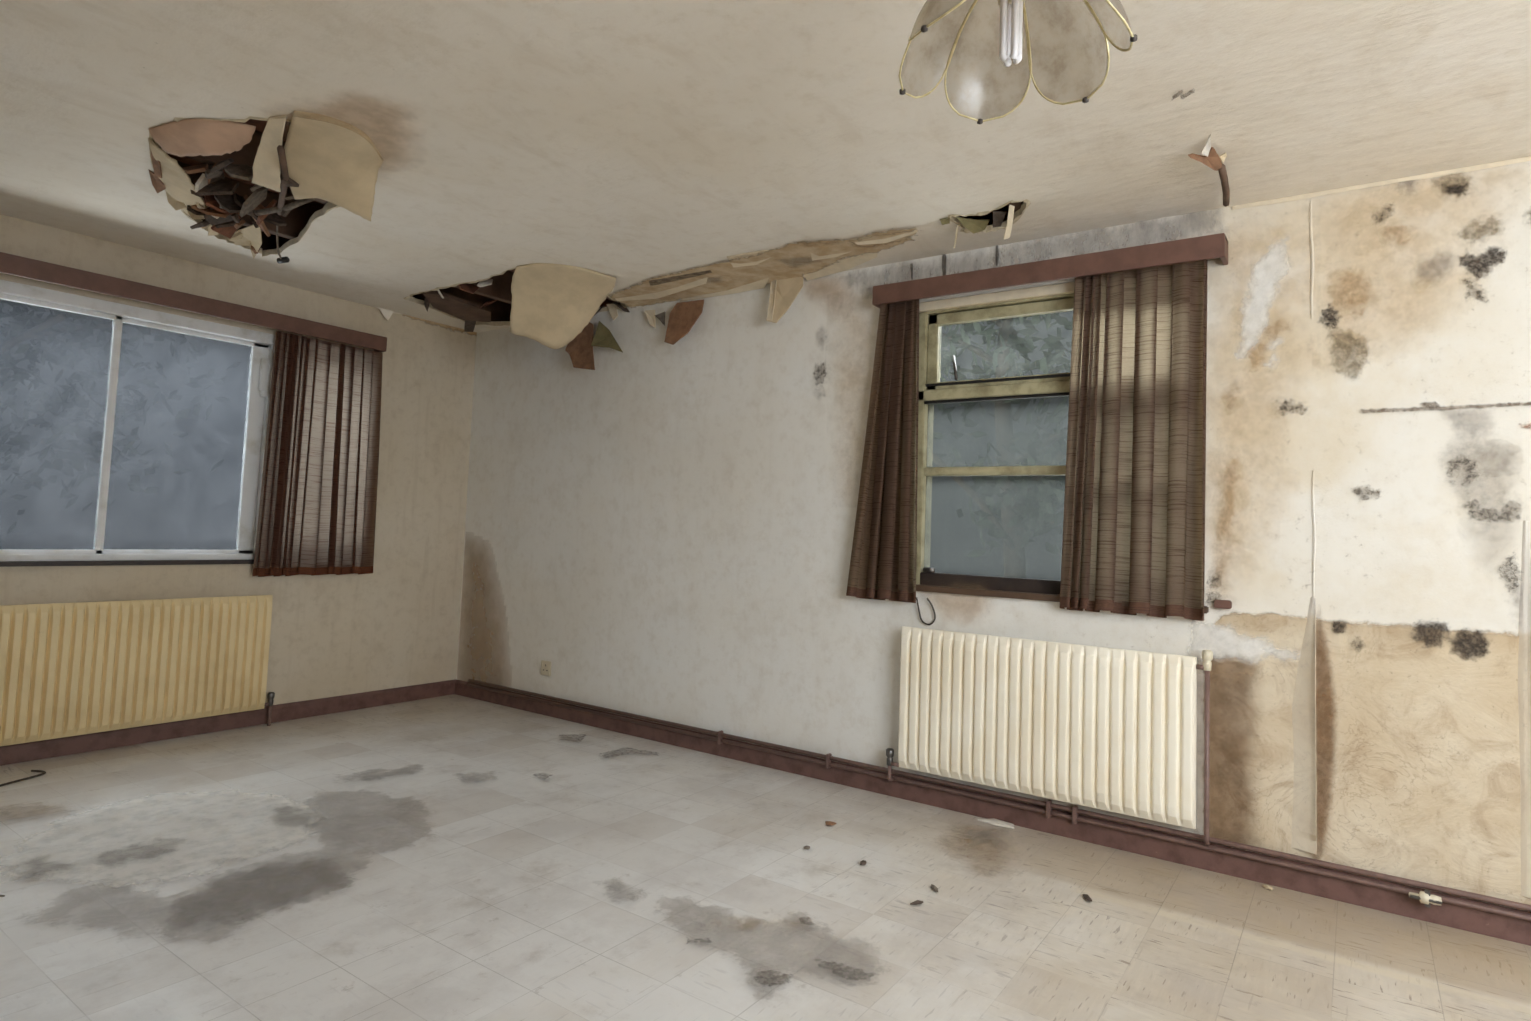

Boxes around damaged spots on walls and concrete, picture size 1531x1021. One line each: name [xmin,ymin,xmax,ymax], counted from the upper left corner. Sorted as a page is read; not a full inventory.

damp [1444,178,1467,194]
damp [1460,225,1505,301]
peeling [1240,244,1288,355]
damp [1321,307,1367,375]
crack [1362,402,1531,413]
damp [1465,504,1520,521]
peeling [1189,624,1294,661]
flaking render [1316,631,1334,848]
damp [1,791,313,887]